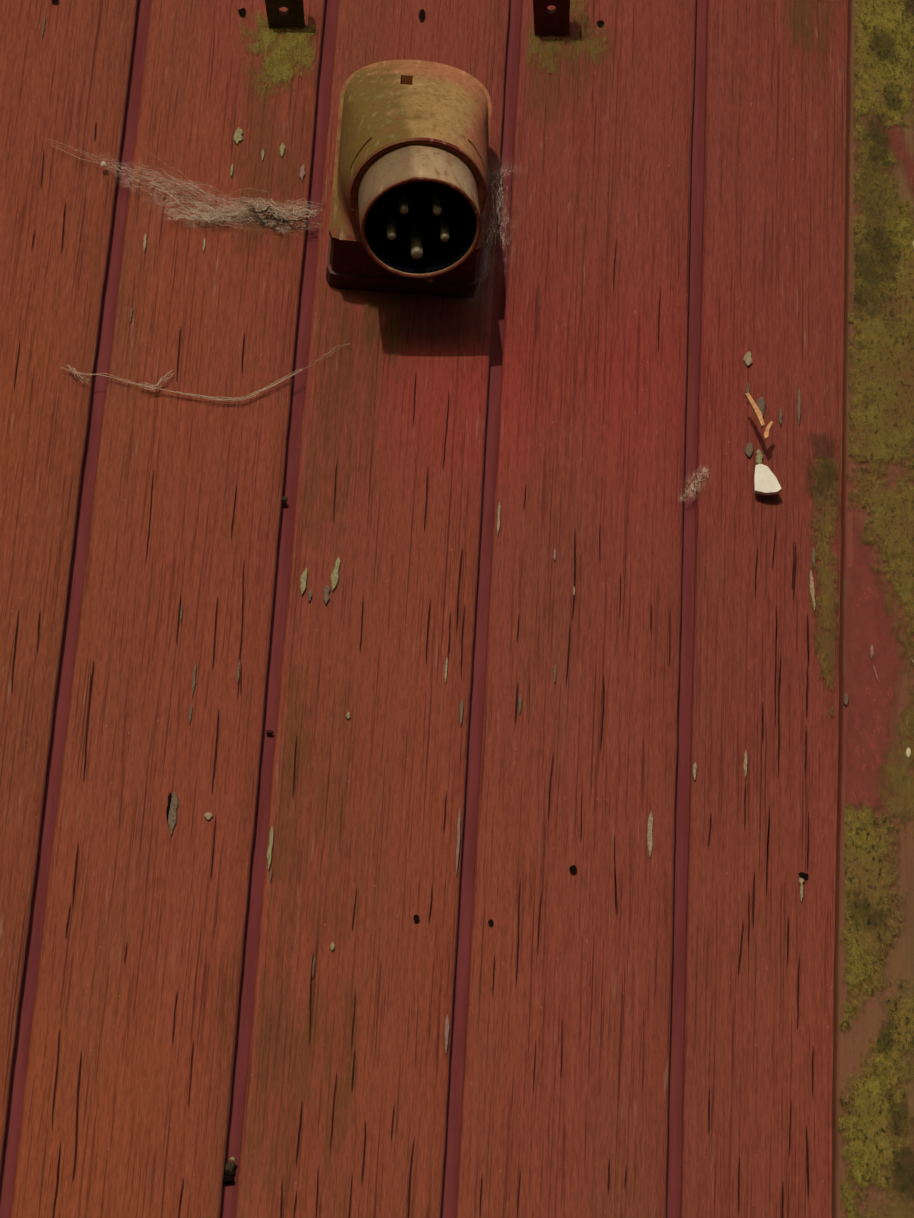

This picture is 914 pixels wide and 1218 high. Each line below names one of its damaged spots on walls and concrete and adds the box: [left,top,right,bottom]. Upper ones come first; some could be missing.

peeling [300,556,341,604]
peeling [166,791,179,834]